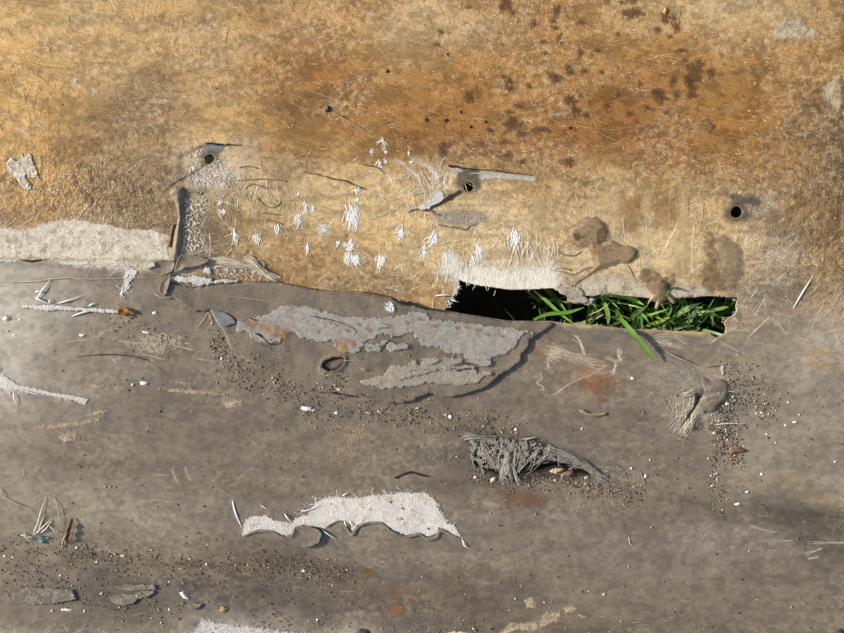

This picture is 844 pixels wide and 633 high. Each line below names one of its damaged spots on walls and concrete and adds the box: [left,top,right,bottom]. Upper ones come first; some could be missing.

rust [497,0,517,18]
rust [540,4,562,55]
rust [604,0,646,19]
rust [653,11,680,39]
rust [547,48,602,84]
rust [637,49,715,116]
rust [563,95,589,118]
rust [485,103,552,164]
spalling [667,283,710,298]
peeling [162,281,553,409]
spalling [462,426,633,485]